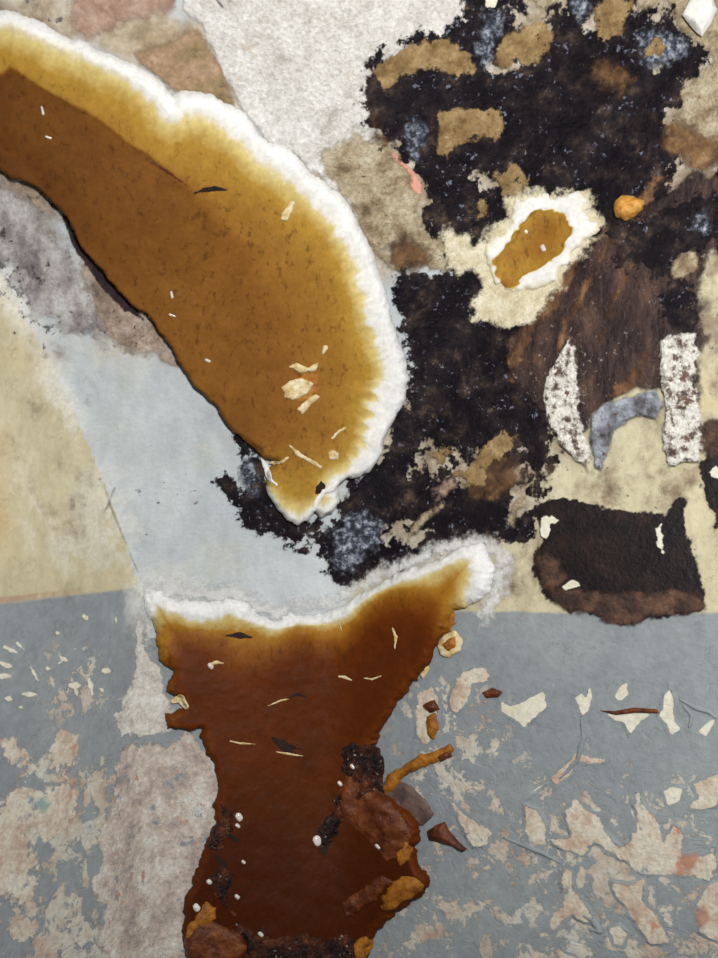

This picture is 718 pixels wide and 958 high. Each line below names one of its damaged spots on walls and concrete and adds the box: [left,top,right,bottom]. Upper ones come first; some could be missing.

flaking render [71,0,477,272]
flaking render [437,107,504,156]
flaking render [495,21,554,70]
leakage [0,177,108,349]
leakage [210,0,718,620]
peeling [543,333,703,469]
peeling [0,726,80,943]
flaking render [91,614,219,958]
peeling [412,663,493,748]
peeling [495,688,551,730]
peeling [521,768,718,958]
peeling [571,669,718,741]